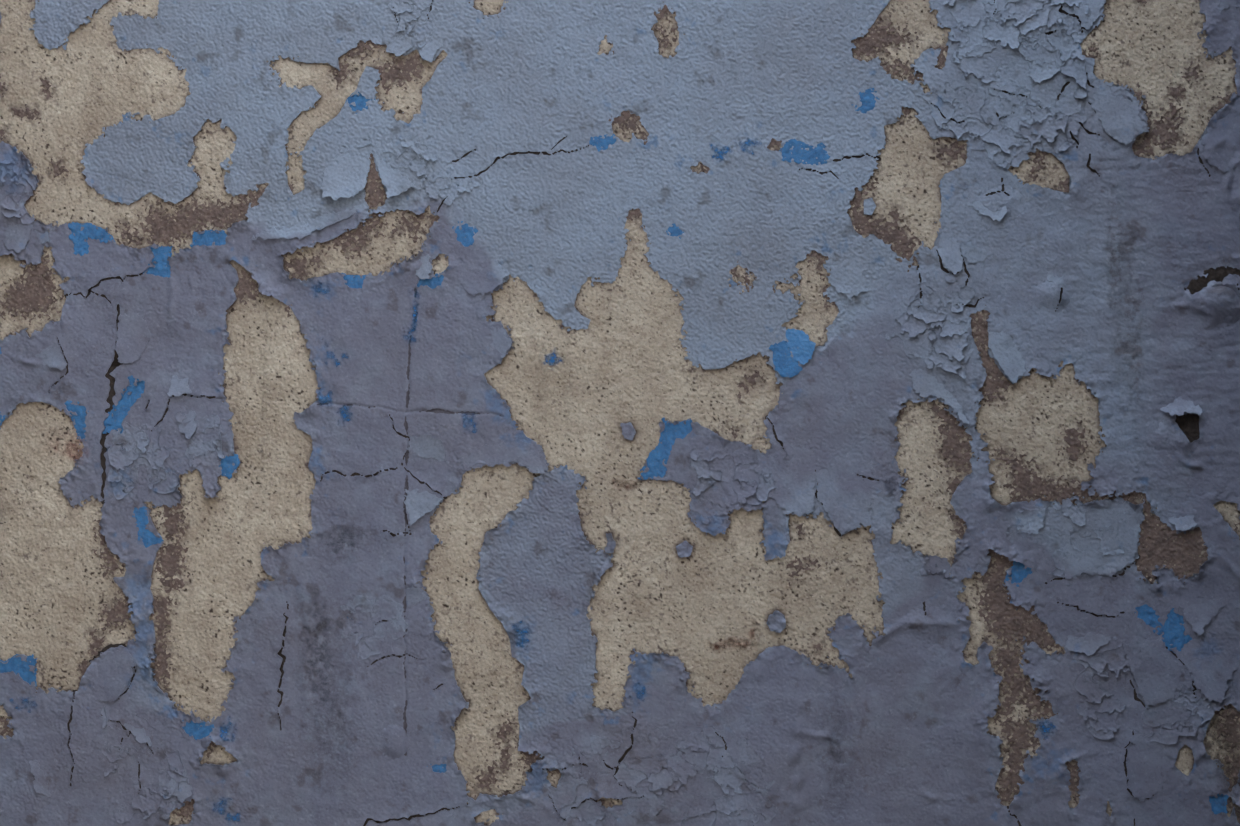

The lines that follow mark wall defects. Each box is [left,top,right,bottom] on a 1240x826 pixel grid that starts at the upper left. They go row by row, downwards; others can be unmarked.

peeling [0,0,269,354]
crack [437,136,589,212]
peeling [0,260,352,826]
crack [277,601,289,730]
crack [317,288,501,756]
peeling [252,0,1240,826]
crack [1123,679,1154,826]
crack [1166,646,1197,698]